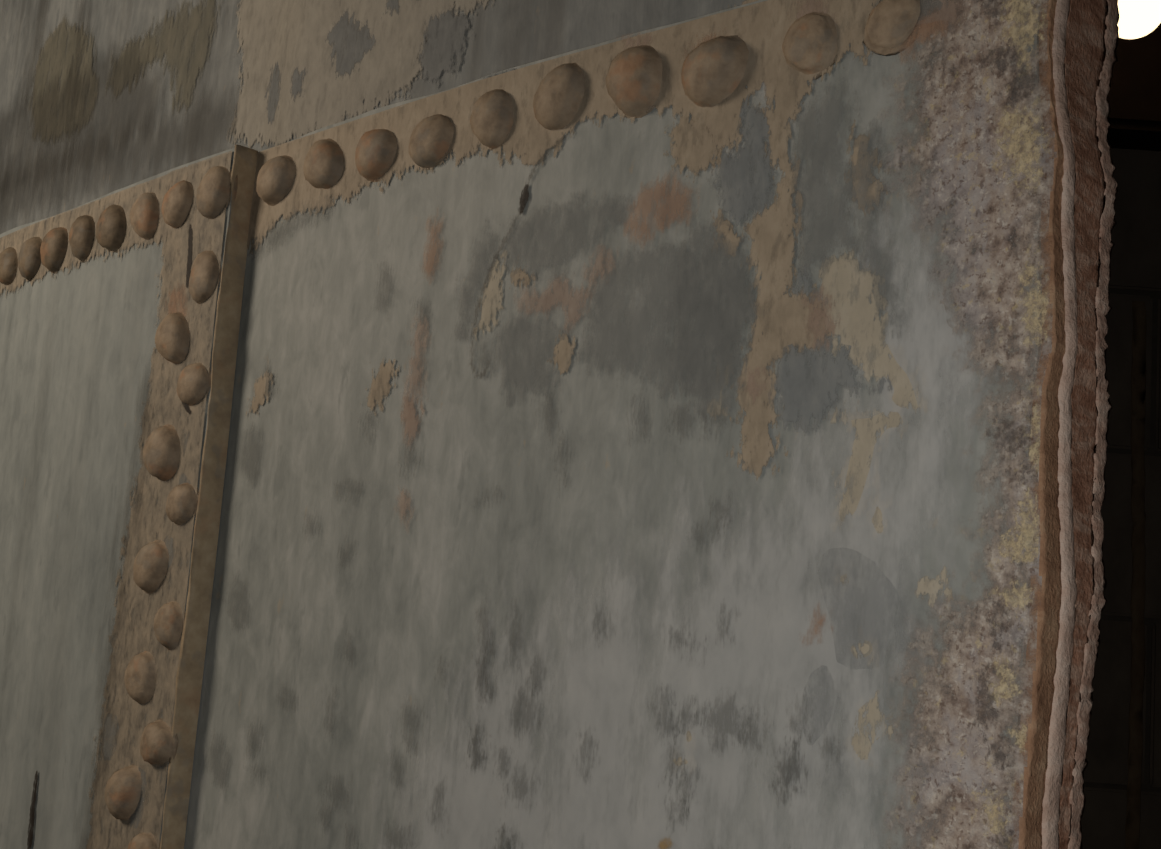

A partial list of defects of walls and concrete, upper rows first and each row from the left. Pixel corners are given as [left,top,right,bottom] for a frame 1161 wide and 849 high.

crack [519,184,529,214]
crack [471,250,512,340]
peeling [0,151,232,849]
peeling [915,566,953,607]